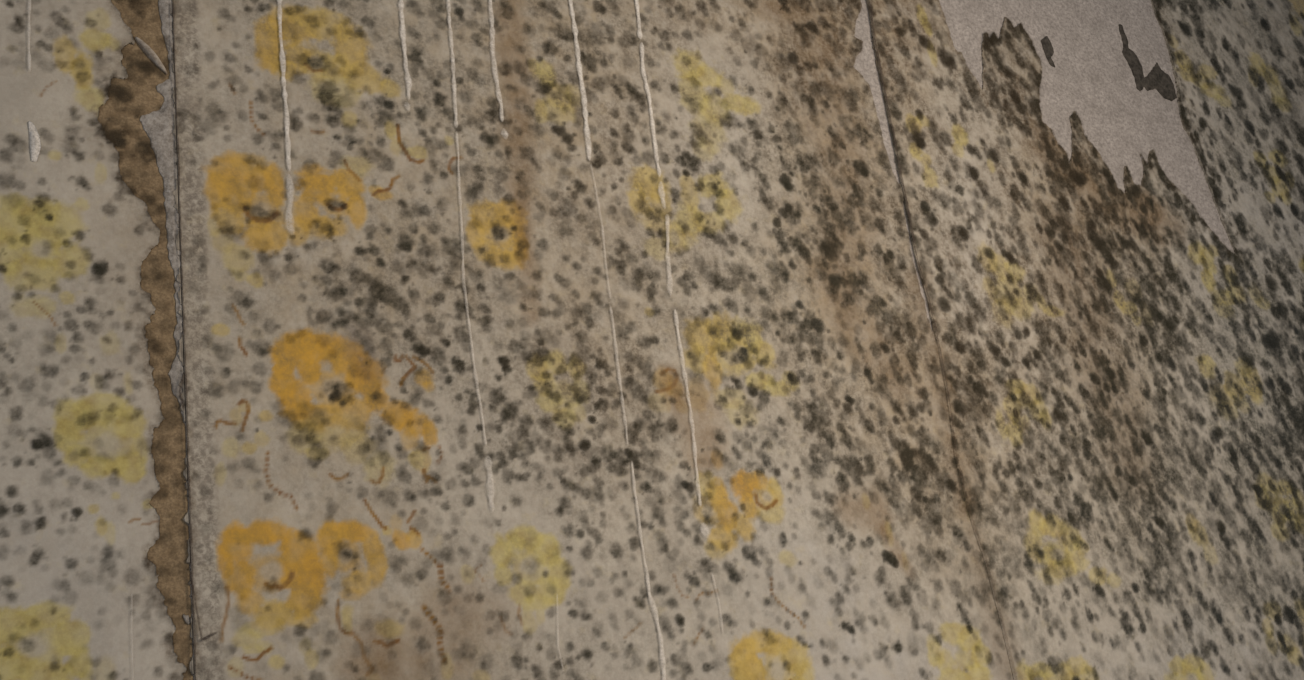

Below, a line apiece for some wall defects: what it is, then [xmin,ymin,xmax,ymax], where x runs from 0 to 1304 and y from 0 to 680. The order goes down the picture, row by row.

leakage [7,2,31,69]
leakage [105,78,132,102]
leakage [92,118,153,161]
leakage [246,0,298,230]
leakage [319,87,367,155]
leakage [386,0,766,333]
peeling [97,0,193,680]
leakage [319,218,490,383]
leakage [720,0,1304,680]
leakage [0,488,24,515]
leakage [17,434,53,465]
leakage [459,310,714,680]